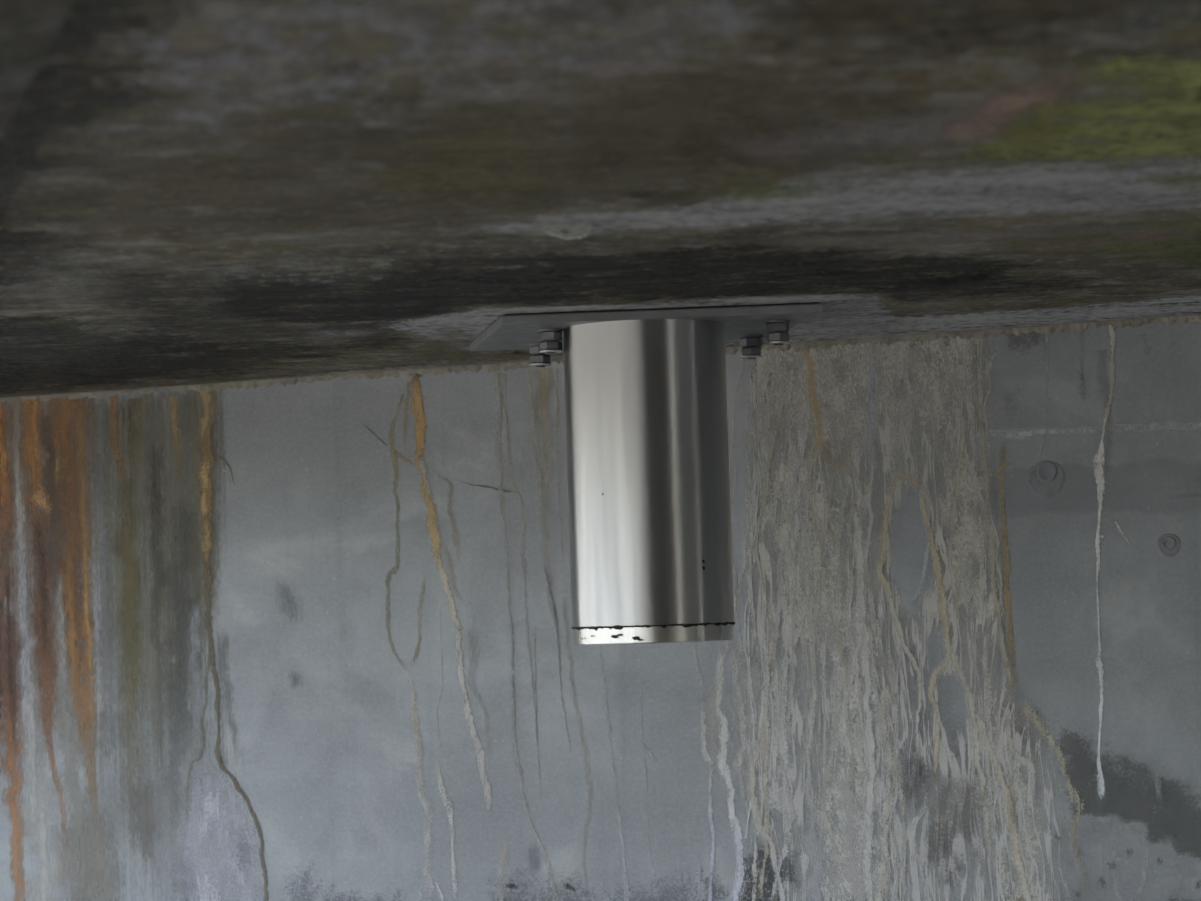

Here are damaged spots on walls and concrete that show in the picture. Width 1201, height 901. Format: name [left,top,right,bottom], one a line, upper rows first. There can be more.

corrosion [0,396,94,901]
crack [470,484,510,492]
water stain [0,221,1201,901]